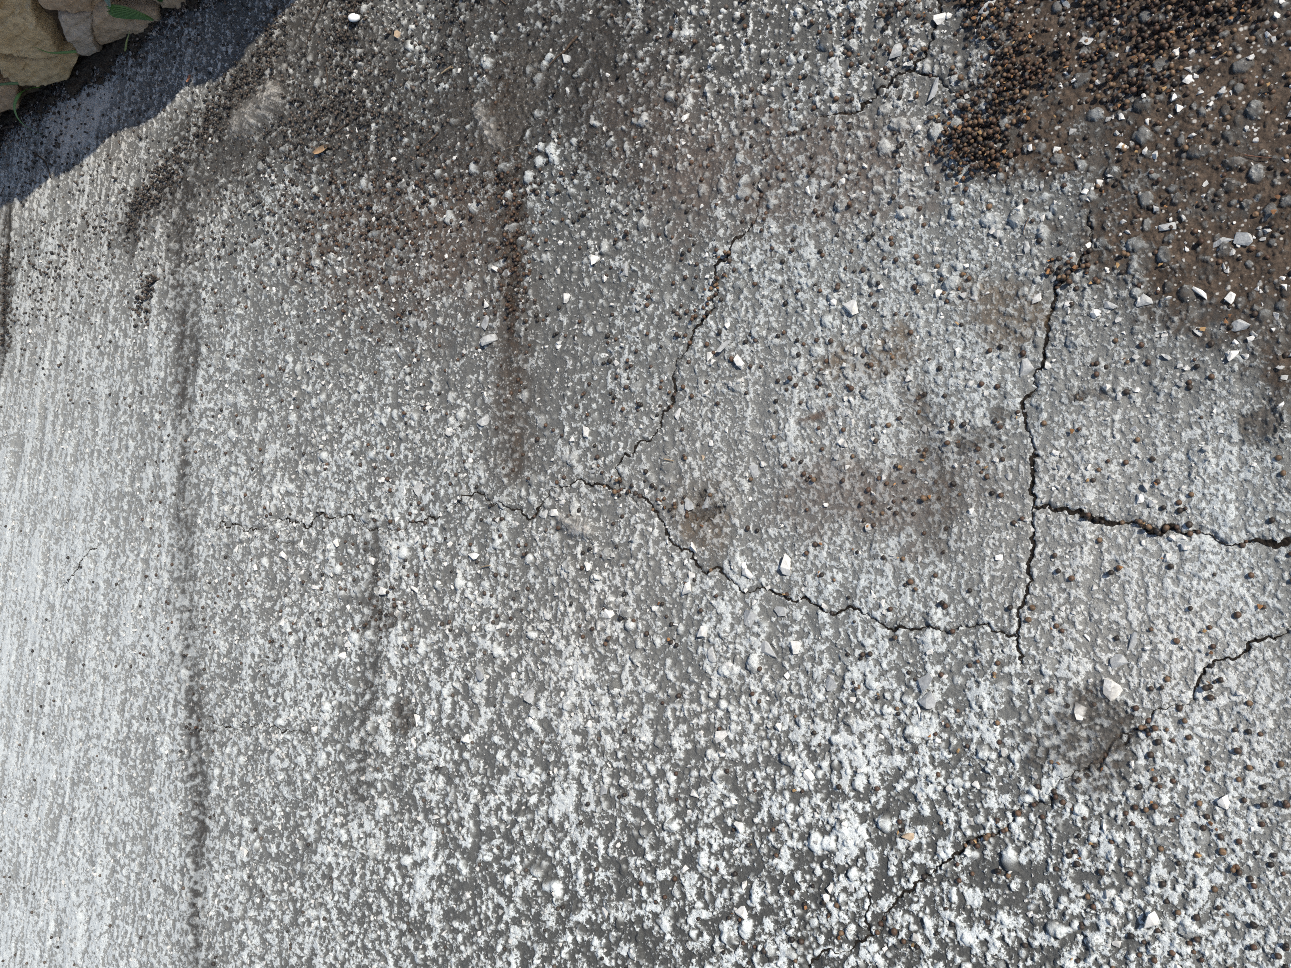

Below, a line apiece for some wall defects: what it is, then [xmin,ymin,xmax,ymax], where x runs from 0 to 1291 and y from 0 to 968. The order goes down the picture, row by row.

crack [216,178,1291,665]
crack [809,627,1291,968]